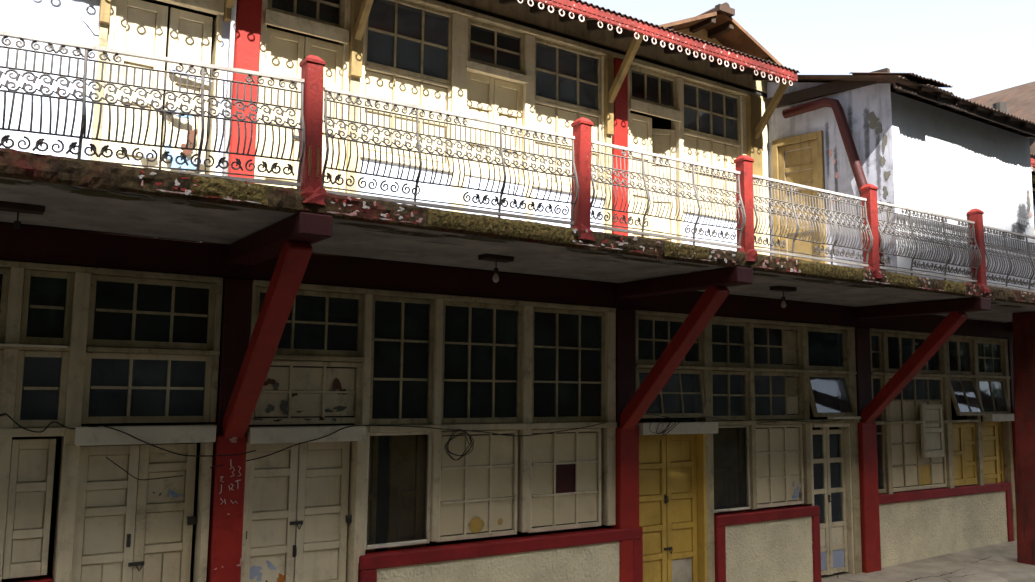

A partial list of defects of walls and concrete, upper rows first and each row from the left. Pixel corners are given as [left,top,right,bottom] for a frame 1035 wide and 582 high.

leakage [826,124,838,210]
leakage [848,108,881,188]
peeling [325,196,423,224]
peeling [758,256,801,273]
peeling [252,378,348,422]